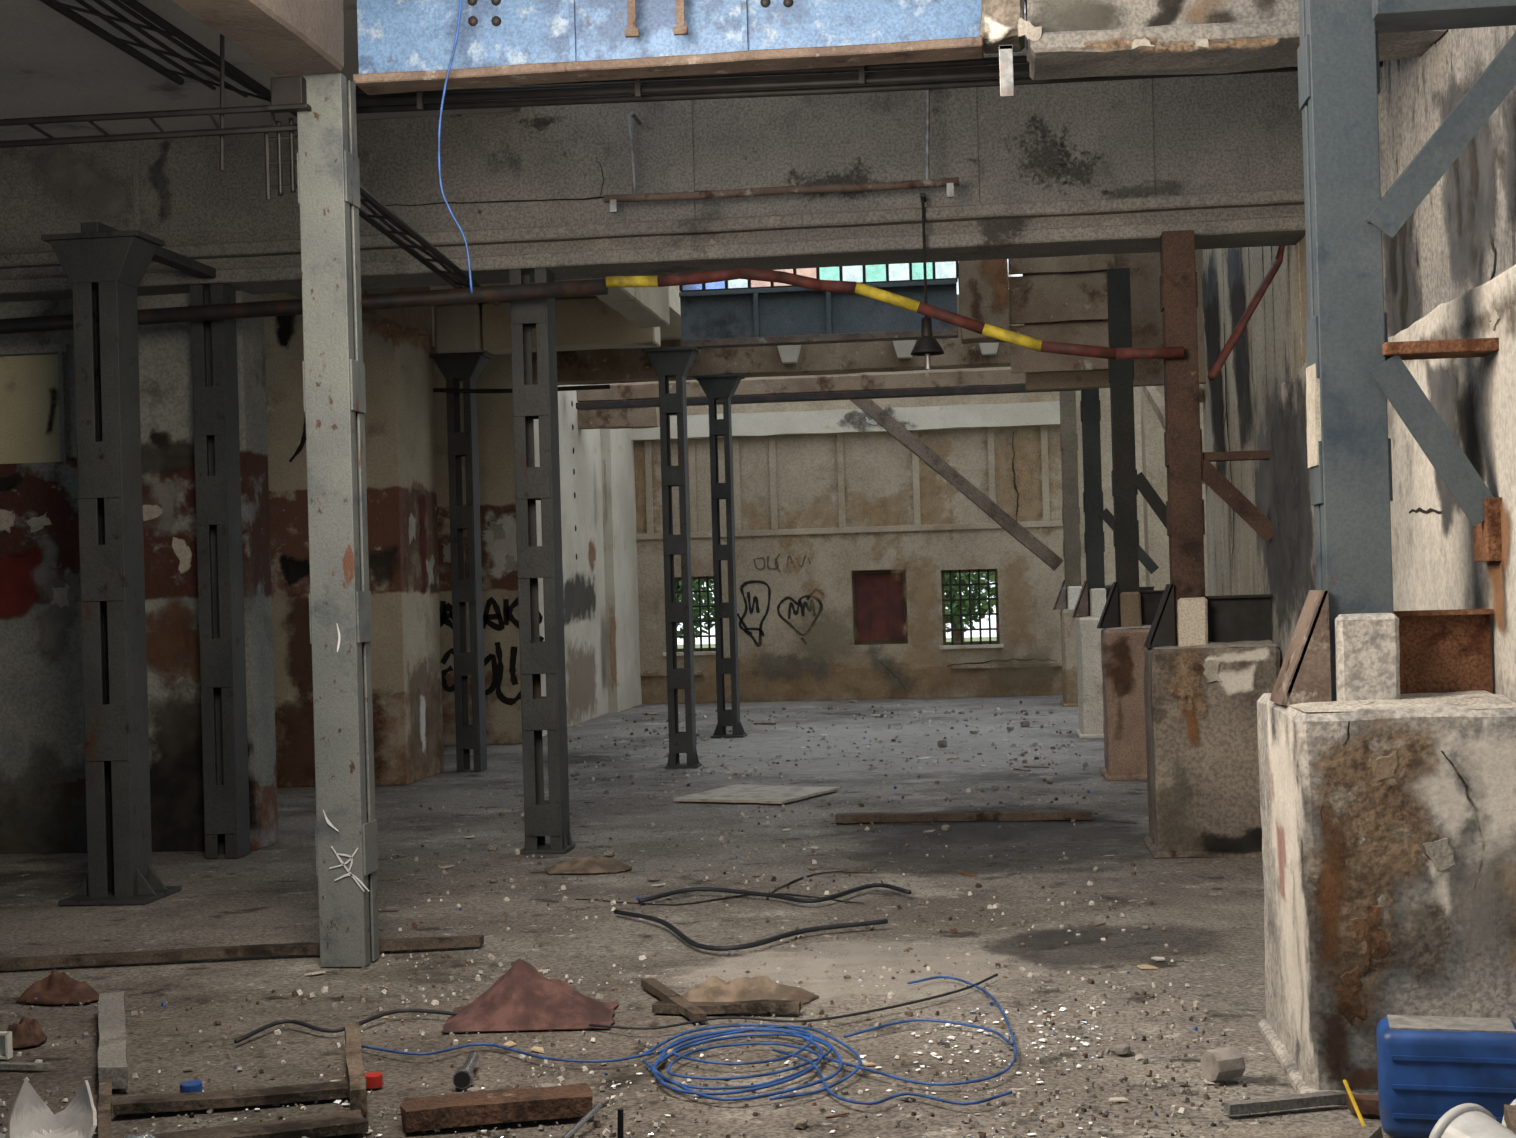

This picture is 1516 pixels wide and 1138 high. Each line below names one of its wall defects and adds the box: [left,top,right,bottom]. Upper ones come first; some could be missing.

water stain [1432,59,1481,125]
water stain [977,216,1031,247]
water stain [1008,116,1179,198]
water stain [1383,217,1421,336]
water stain [1442,88,1516,288]
water stain [1426,361,1482,477]
peeling [0,509,81,661]
peeling [404,483,451,593]
peeling [483,511,517,578]
water stain [1434,468,1460,534]
crack [1441,751,1485,872]